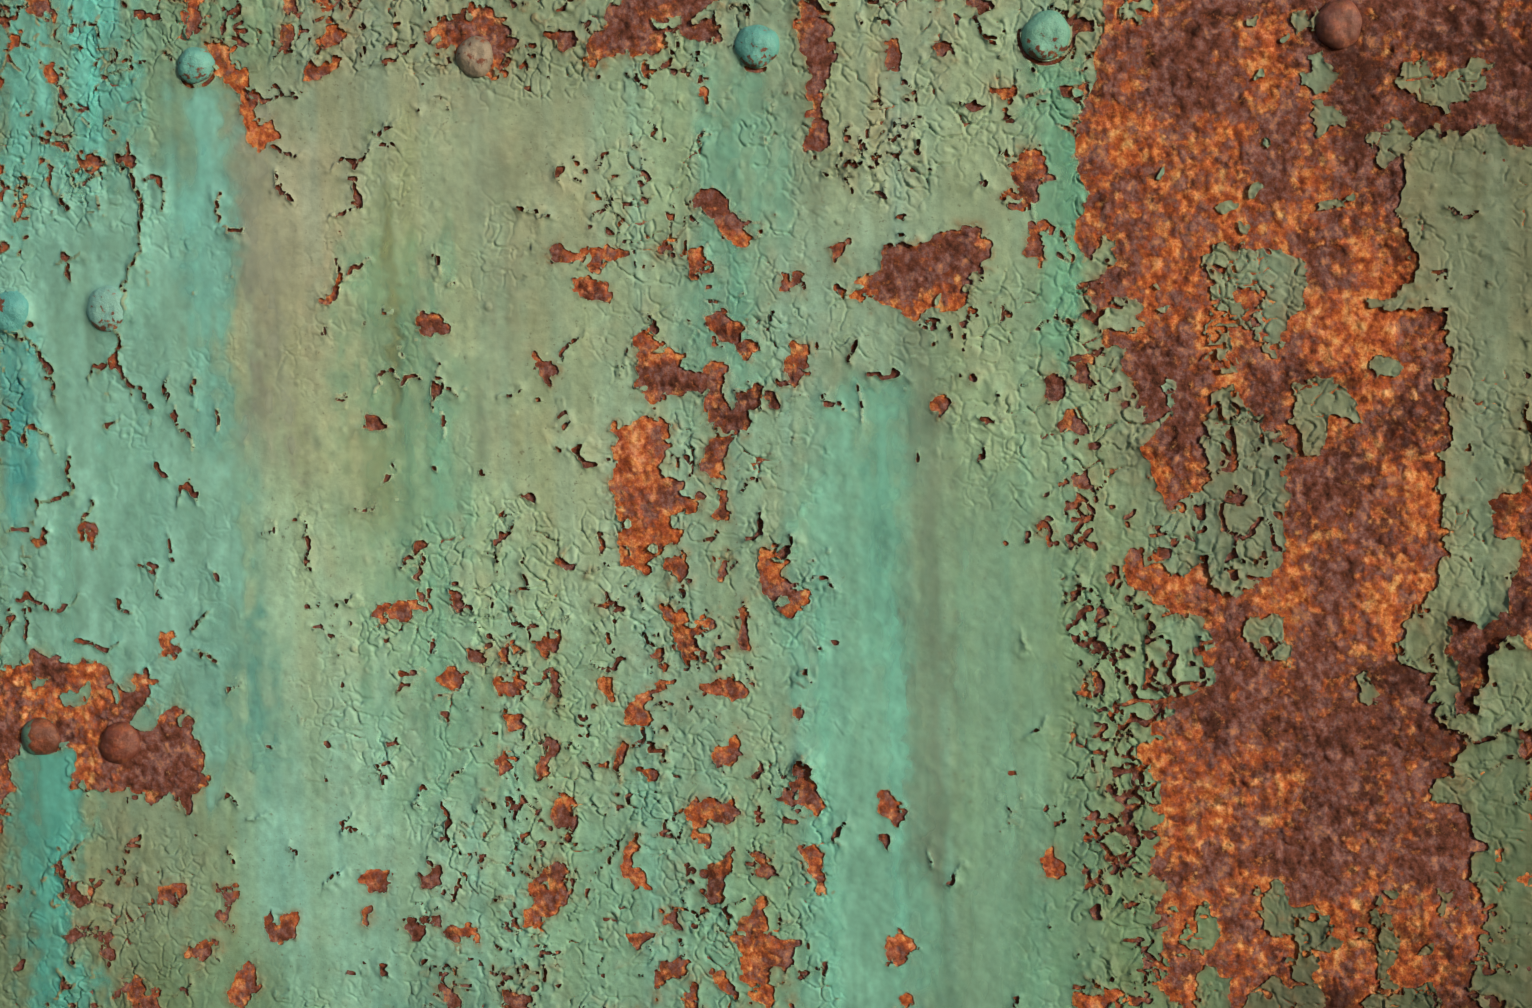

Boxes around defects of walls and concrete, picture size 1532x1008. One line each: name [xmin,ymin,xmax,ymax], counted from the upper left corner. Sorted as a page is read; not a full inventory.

corrosion [833,225,994,322]
peeling [1201,241,1308,366]
crack [400,540,530,627]
crack [571,444,598,468]
corrosion [597,308,816,784]
crack [740,477,834,588]
corrosion [1040,0,1532,1008]
peeling [1288,376,1363,456]
peeling [1366,123,1532,1008]
corrosion [0,648,211,833]
crack [376,764,464,842]
peeling [1194,904,1344,1008]